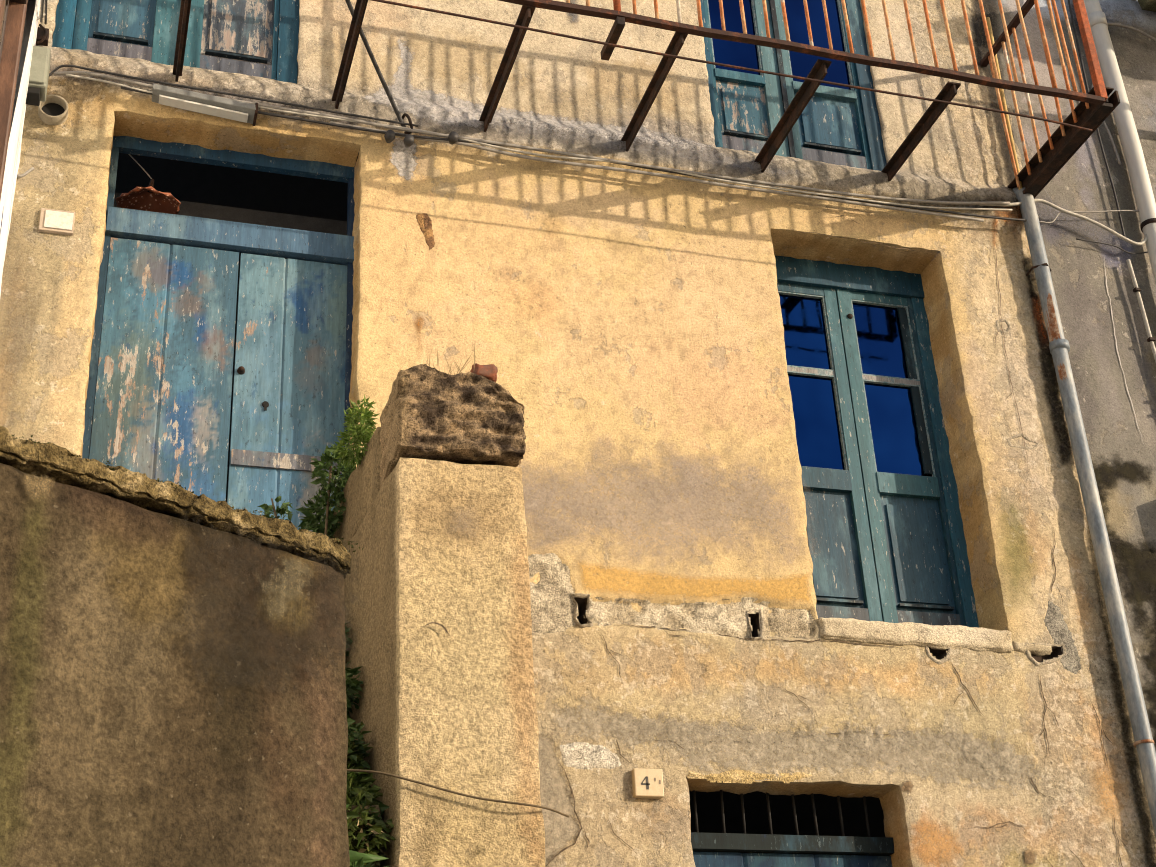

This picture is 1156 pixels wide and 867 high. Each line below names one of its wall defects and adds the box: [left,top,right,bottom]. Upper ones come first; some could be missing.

corrosion [1033,293,1061,342]
corrosion [1057,363,1067,381]
spalling [528,553,816,640]
crack [1049,521,1063,605]
crack [953,668,984,716]
crack [1028,666,1058,798]
spalling [1044,601,1081,674]
crack [1088,695,1112,776]
water stain [1088,459,1156,867]
crack [545,764,634,867]
crack [1091,811,1131,867]